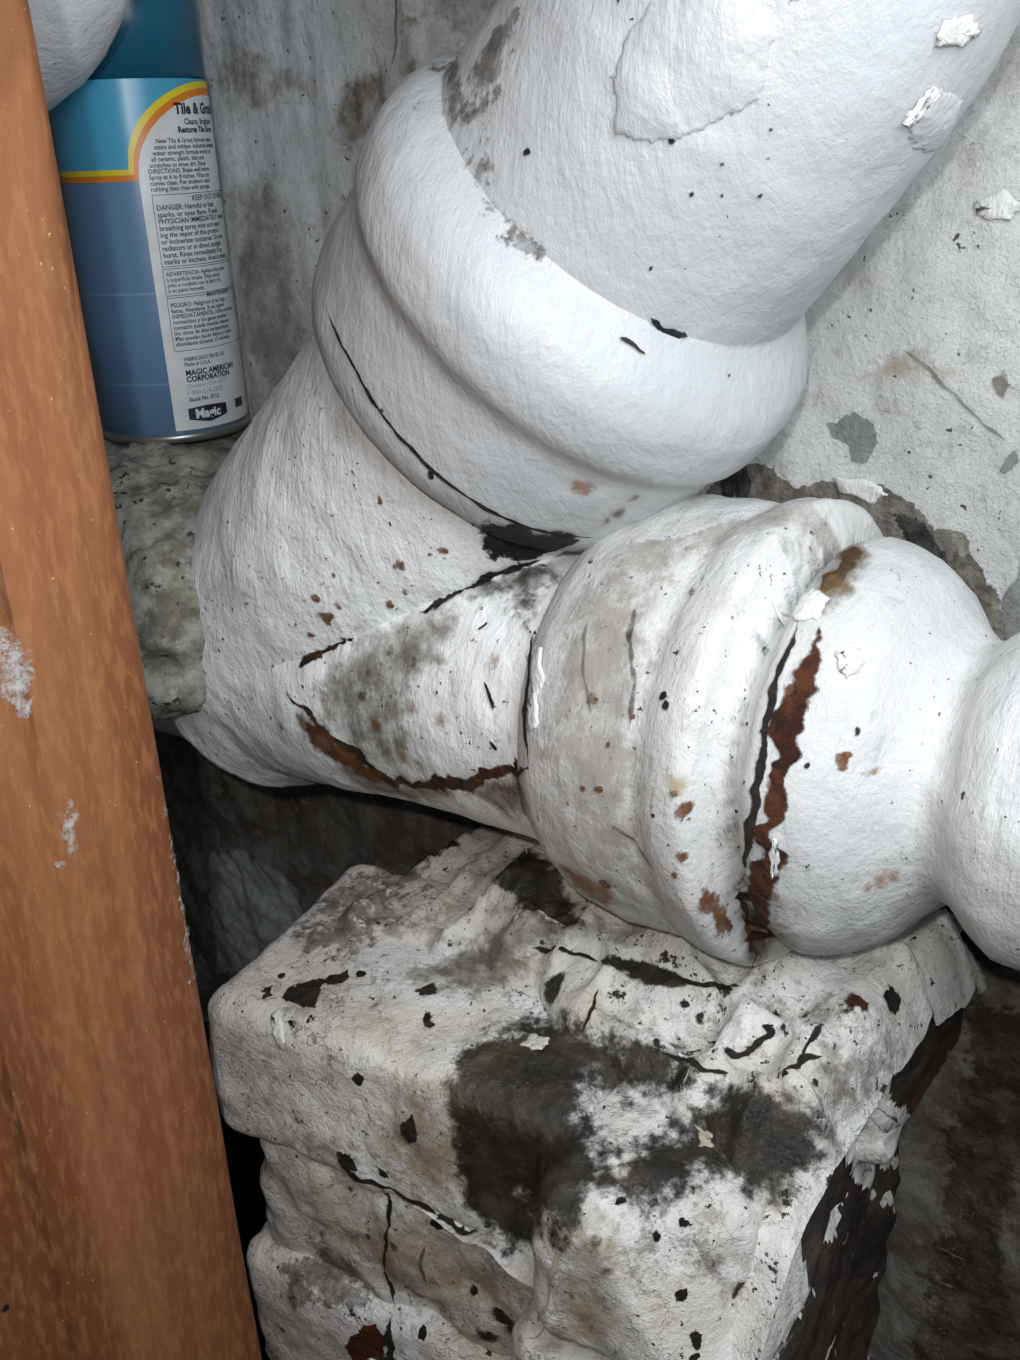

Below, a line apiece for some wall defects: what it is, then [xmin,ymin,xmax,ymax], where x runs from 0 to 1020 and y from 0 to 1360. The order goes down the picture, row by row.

crack [389,0,397,80]
crack [325,306,592,538]
spalling [827,412,878,463]
rust [294,594,354,668]
leakage [324,519,580,762]
spalling [707,463,1020,641]
rust [287,693,529,814]
rust [698,545,867,967]
crack [332,1161,493,1307]
leakage [395,971,870,1257]
peeling [845,1092,910,1192]
leakage [908,998,1020,1360]